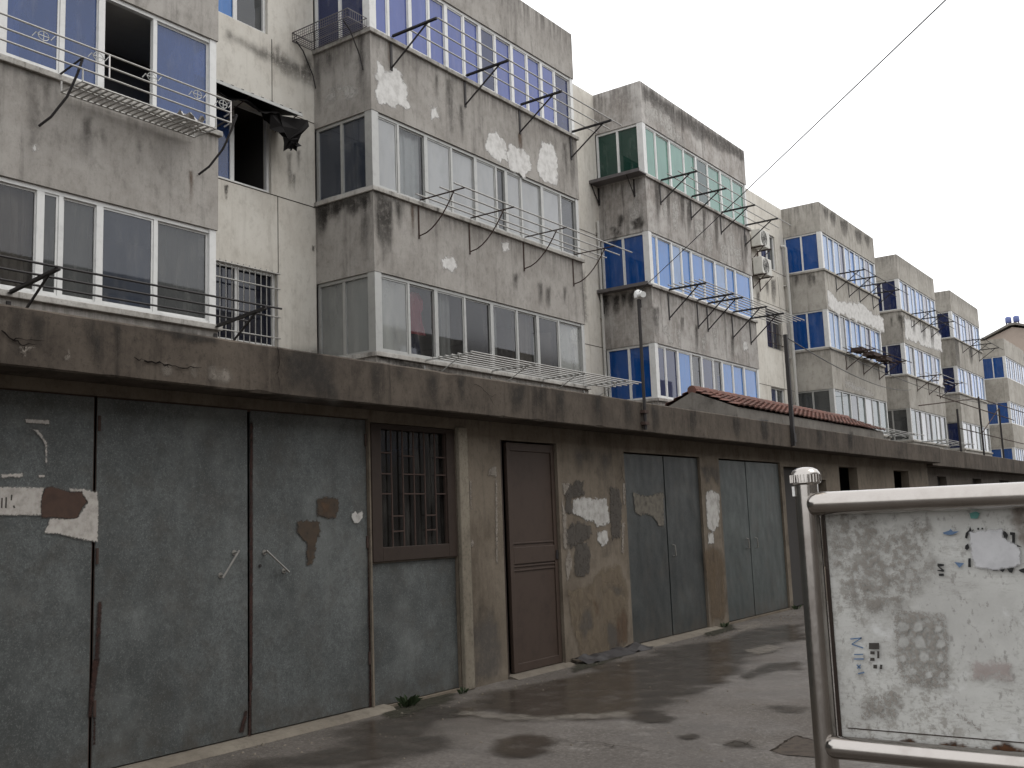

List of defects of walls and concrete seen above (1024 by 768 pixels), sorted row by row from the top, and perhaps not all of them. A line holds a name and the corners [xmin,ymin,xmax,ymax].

peeling [375,61,410,109]
peeling [485,132,558,186]
peeling [441,256,457,272]
crack [1,330,42,351]
crack [134,357,201,369]
peeling [562,480,664,581]
peeling [706,490,720,544]